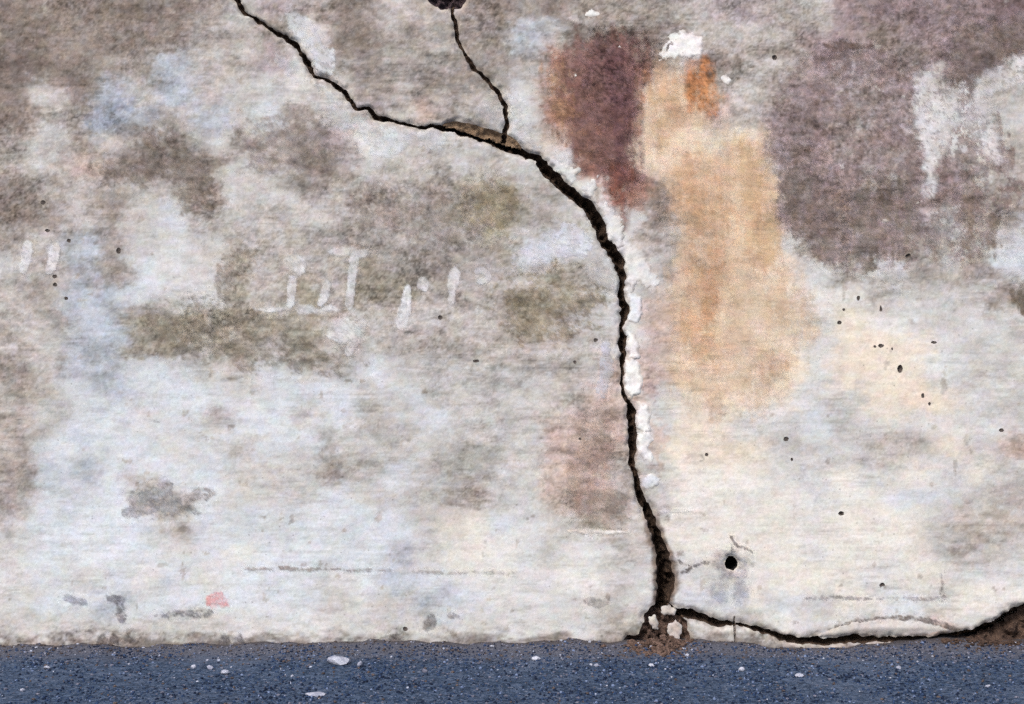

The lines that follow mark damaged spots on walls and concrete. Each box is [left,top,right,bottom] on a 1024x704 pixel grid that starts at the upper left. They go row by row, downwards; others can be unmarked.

corrosion [551,32,651,198]
corrosion [686,57,717,115]
leakage [877,0,1024,263]
crack [234,0,1024,646]